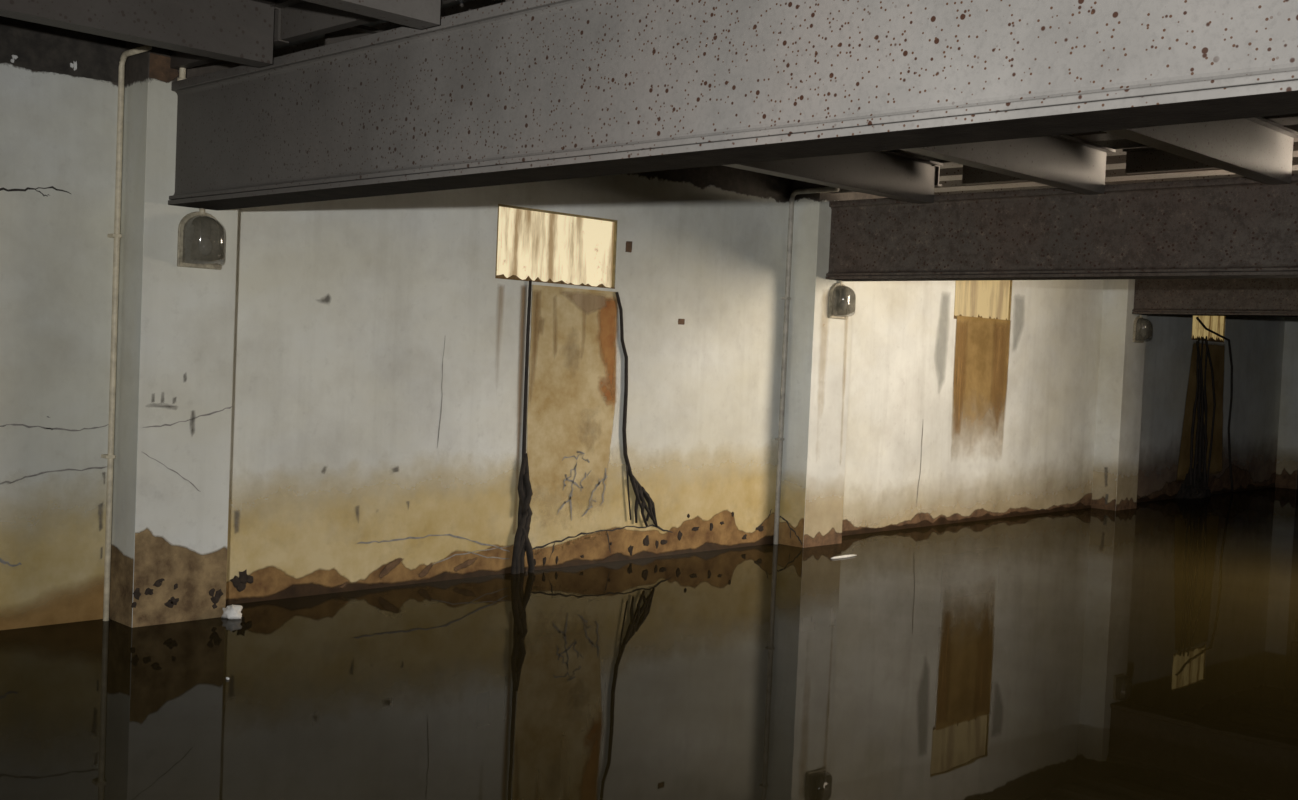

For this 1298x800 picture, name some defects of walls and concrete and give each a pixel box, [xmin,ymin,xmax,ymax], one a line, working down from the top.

crack [0,186,71,196]
crack [0,416,109,431]
crack [143,406,232,492]
crack [0,466,107,485]
leakage [1208,448,1298,492]
leakage [0,451,1185,630]
spalling [131,578,179,608]
spalling [209,569,253,609]